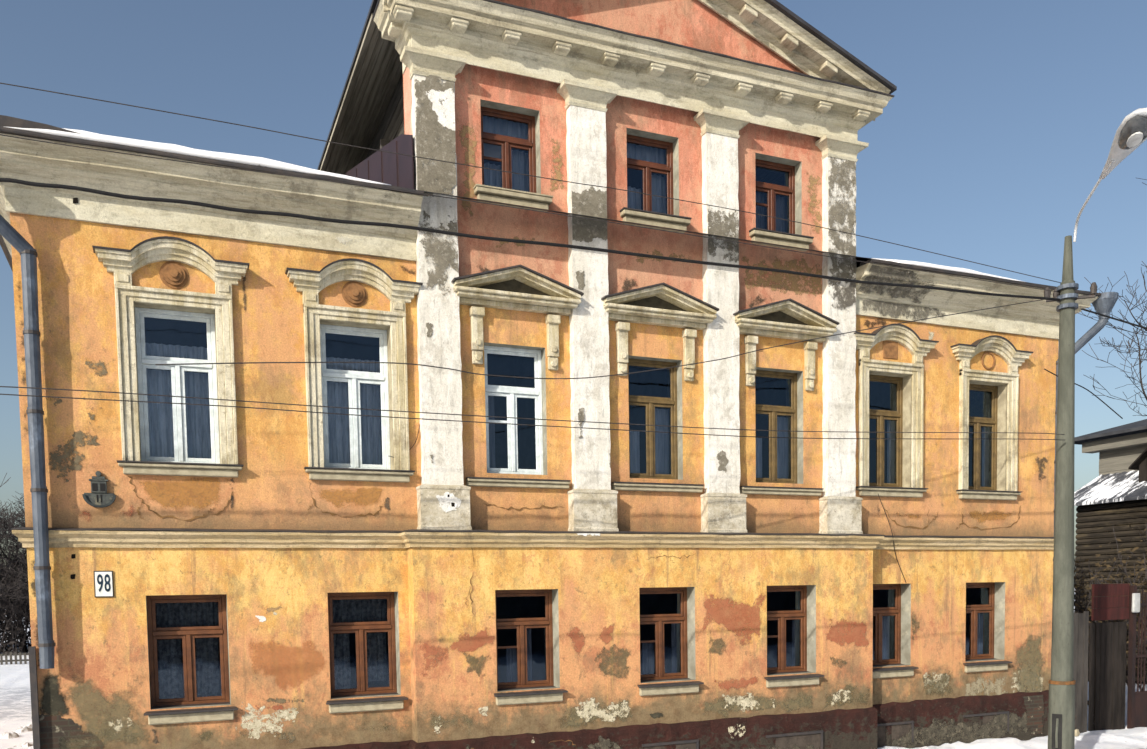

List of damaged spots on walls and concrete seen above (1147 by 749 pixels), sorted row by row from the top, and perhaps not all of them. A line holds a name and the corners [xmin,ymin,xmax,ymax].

peeling [415,75,478,216]
peeling [419,210,458,296]
peeling [708,157,944,340]
flaking render [49,393,101,483]
crack [127,474,233,521]
crack [308,482,384,517]
crack [484,503,562,511]
peeling [703,595,765,645]
spalling [39,714,104,749]
peeling [235,698,305,743]
peeling [576,697,631,724]
peeling [715,677,775,738]